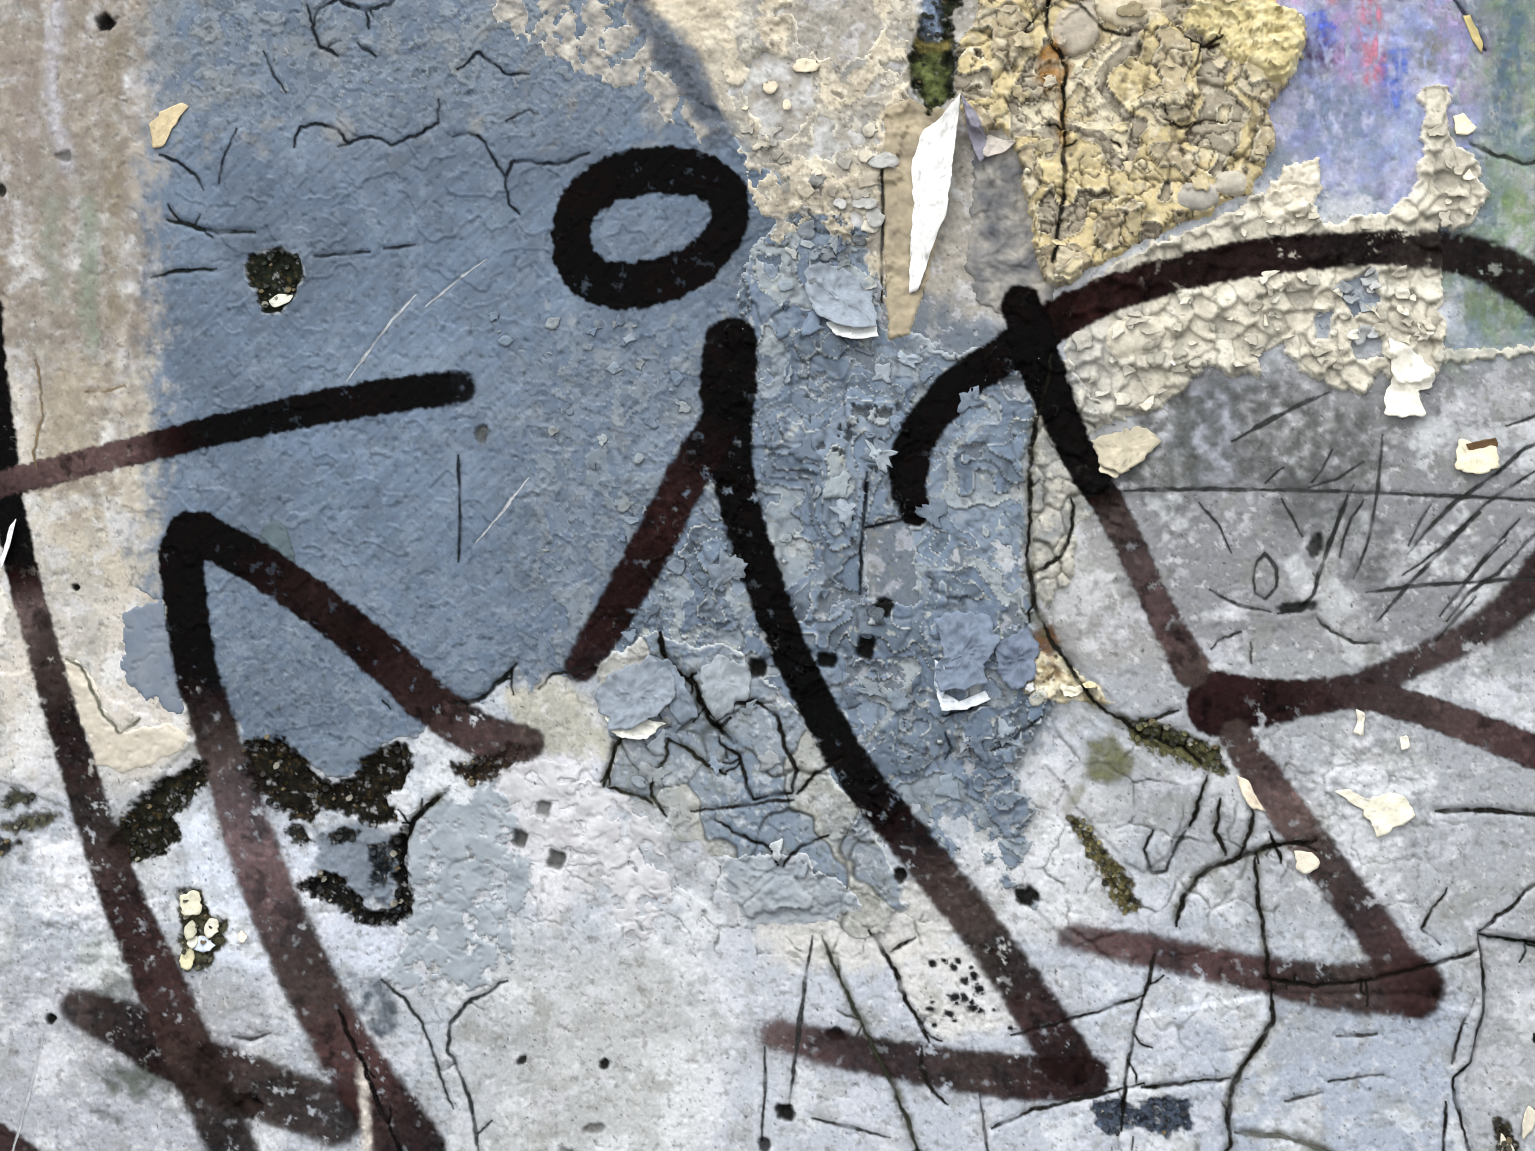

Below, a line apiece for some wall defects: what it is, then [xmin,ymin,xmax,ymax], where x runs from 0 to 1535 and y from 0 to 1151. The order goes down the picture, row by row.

crack [306,0,394,57]
crack [150,128,256,278]
crack [313,244,416,257]
crack [263,50,590,215]
peeling [450,0,1535,951]
crack [600,631,843,867]
crack [942,701,987,760]
crack [990,353,1535,1151]
crack [822,929,949,1151]